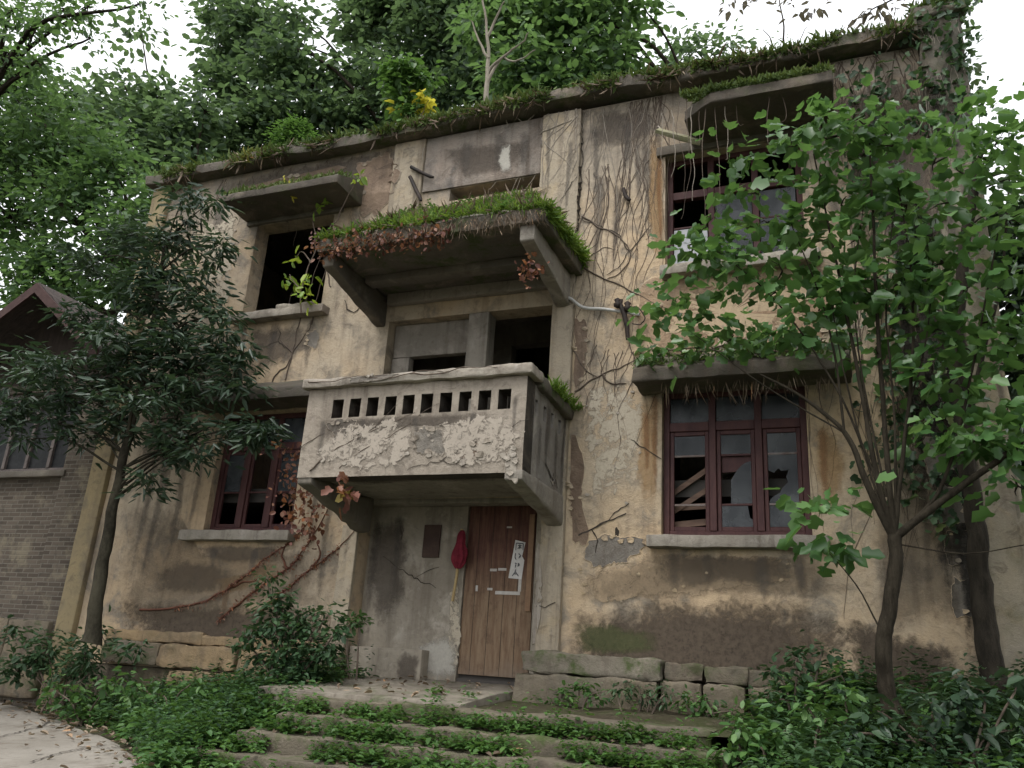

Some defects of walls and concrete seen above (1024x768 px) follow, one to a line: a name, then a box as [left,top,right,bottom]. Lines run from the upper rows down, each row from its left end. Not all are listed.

crack [560,121,645,275]
leakage [835,86,964,509]
peeling [317,414,525,484]
flaking render [565,318,791,603]
leakage [160,546,279,591]
leakage [668,556,780,584]
leakage [126,604,331,650]
leakage [579,600,877,685]
leakage [892,636,952,691]